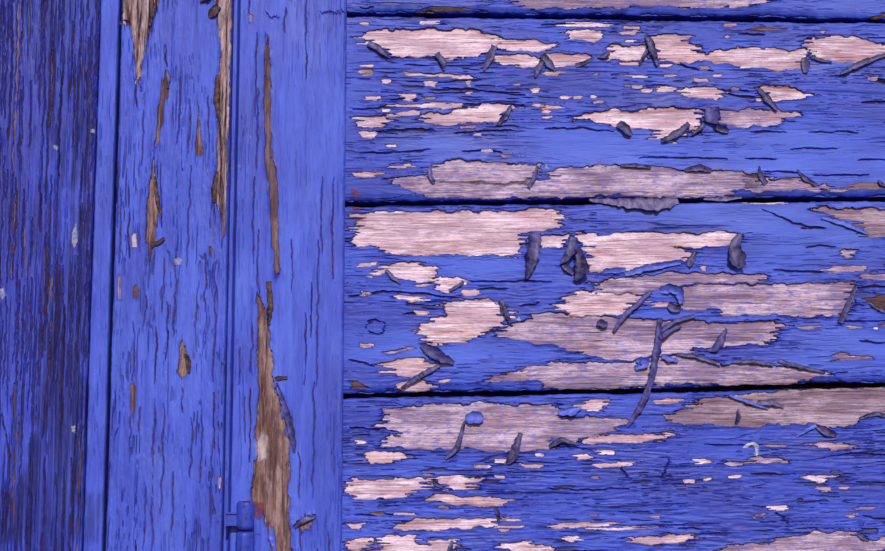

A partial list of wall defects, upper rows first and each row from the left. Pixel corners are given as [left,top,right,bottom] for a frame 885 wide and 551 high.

peeling [119,0,159,89]
peeling [200,0,233,239]
peeling [351,6,885,144]
peeling [251,34,316,551]
peeling [342,149,885,551]